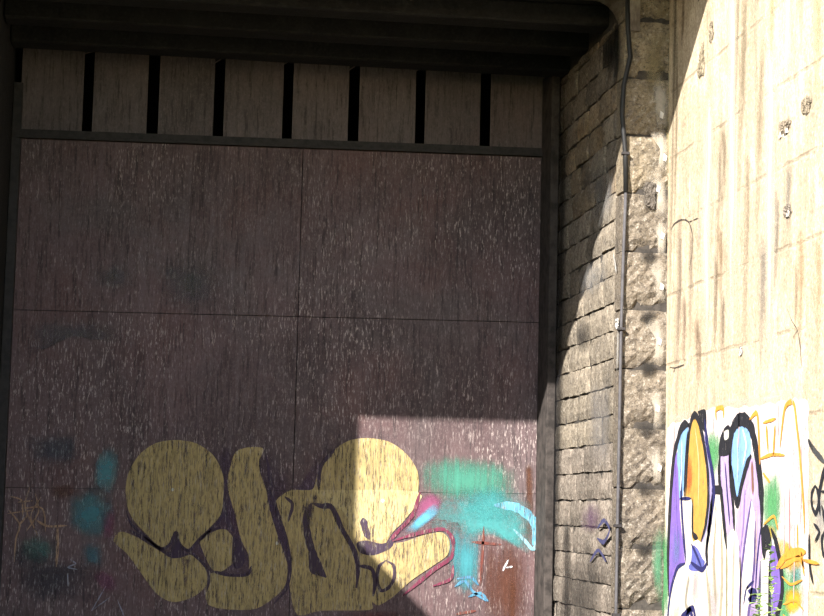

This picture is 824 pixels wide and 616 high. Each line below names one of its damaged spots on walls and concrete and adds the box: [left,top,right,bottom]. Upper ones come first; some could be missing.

spalling [697,21,714,77]
spalling [778,120,791,138]
spalling [801,96,812,115]
damp [698,110,712,302]